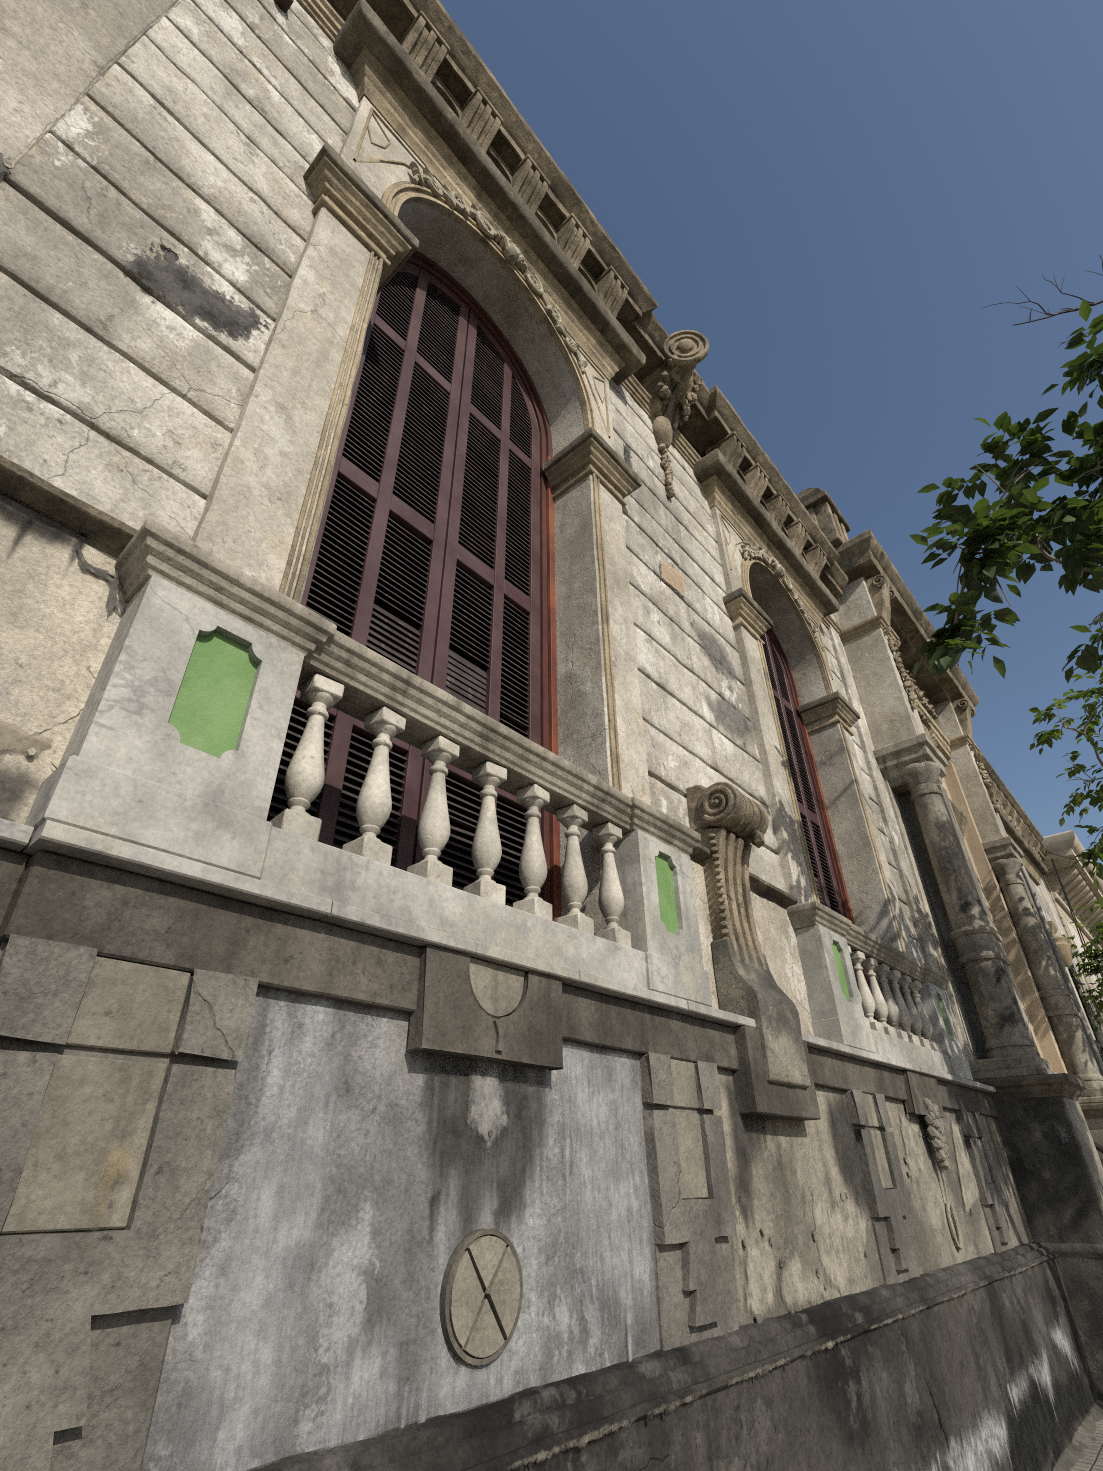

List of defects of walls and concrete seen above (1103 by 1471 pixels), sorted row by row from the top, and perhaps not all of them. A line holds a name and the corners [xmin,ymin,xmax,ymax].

water stain [0,769,39,819]
water stain [427,1055,547,1251]
water stain [565,1054,650,1362]
water stain [932,1324,1093,1471]